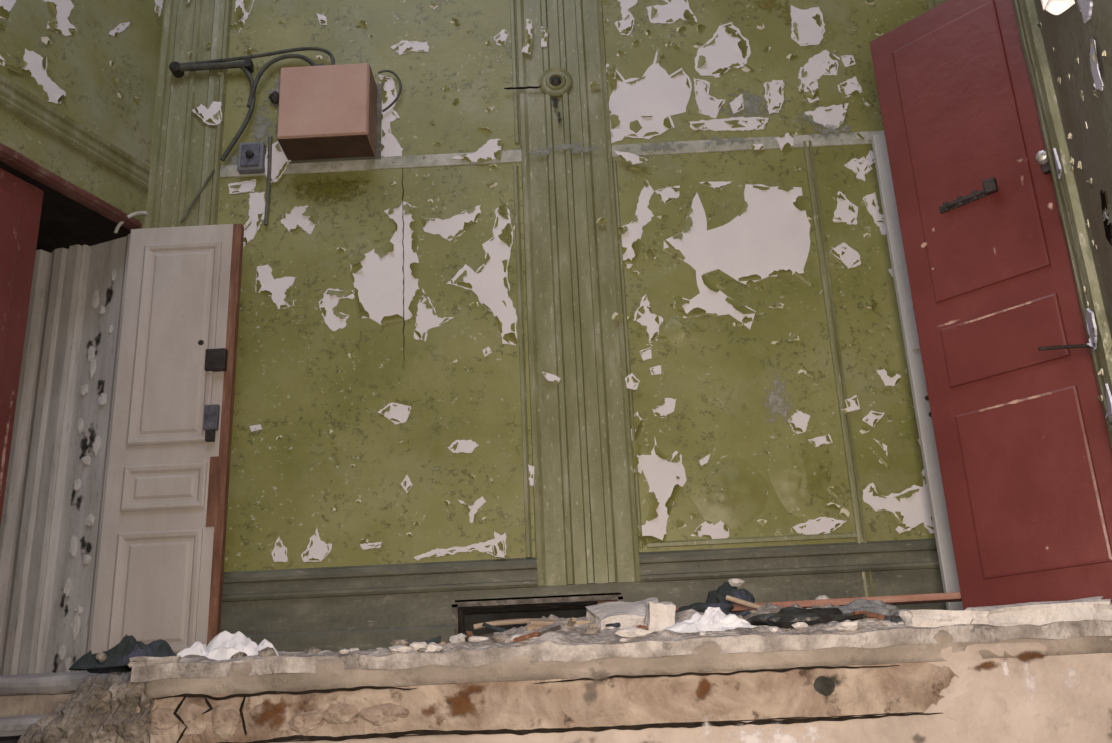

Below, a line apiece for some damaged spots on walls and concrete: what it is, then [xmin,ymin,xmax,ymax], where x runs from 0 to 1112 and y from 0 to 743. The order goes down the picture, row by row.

peeling [0,0,77,104]
peeling [229,0,255,31]
peeling [590,0,873,165]
peeling [1057,38,1106,100]
peeling [833,133,887,239]
peeling [319,199,482,342]
peeling [446,203,518,357]
peeling [596,180,815,390]
peeling [830,242,861,269]
peeling [630,398,730,548]
peeling [757,486,850,536]
peeling [862,469,934,534]